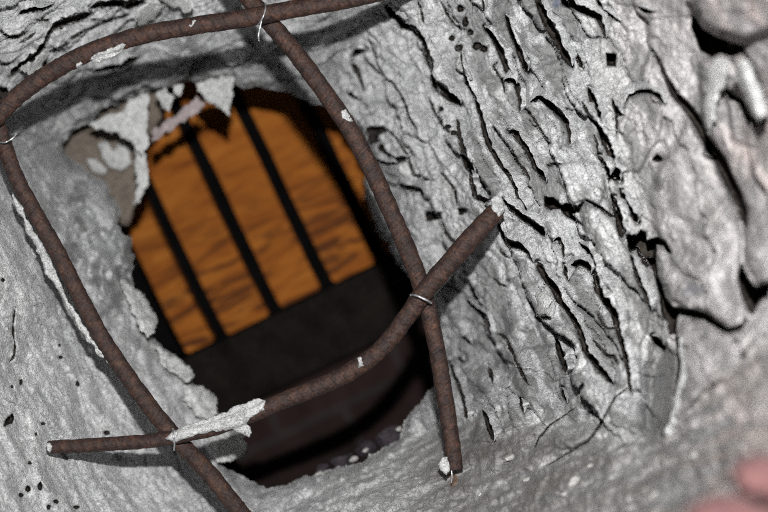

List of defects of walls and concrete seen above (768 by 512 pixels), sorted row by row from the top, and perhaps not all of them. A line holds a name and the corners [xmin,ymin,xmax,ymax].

spalling [0,0,505,512]
crack [347,36,416,129]
crack [375,0,749,465]
crack [726,54,766,125]